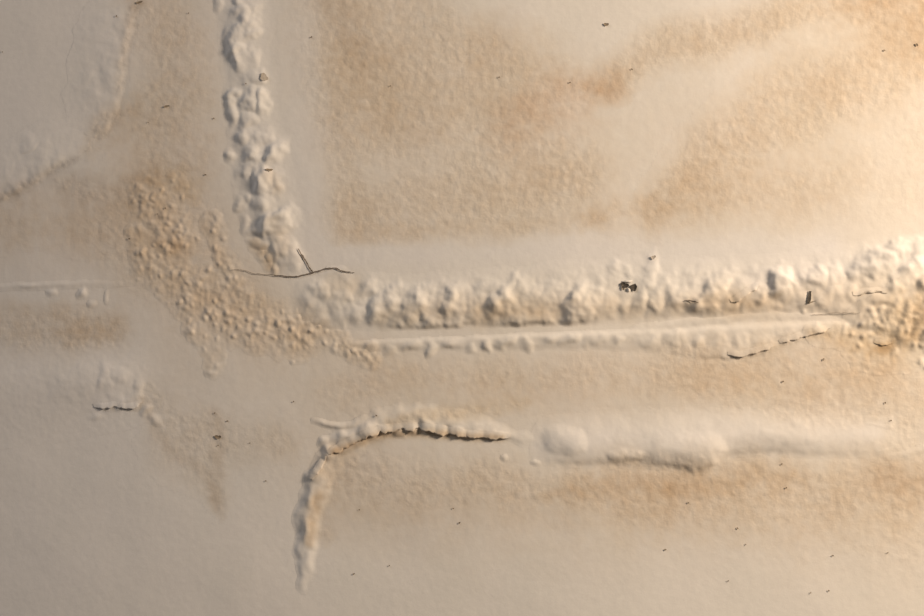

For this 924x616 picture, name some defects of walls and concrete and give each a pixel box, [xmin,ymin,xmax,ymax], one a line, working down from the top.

water stain [273,0,924,256]
crack [234,249,354,277]
water stain [323,435,924,567]